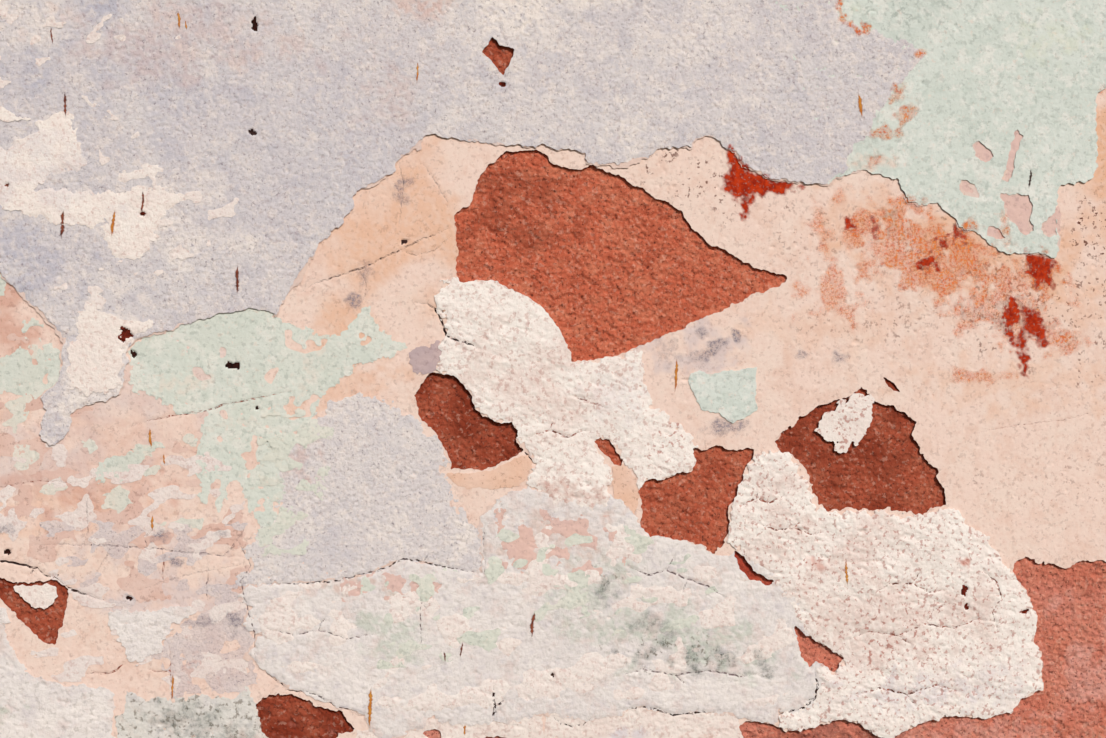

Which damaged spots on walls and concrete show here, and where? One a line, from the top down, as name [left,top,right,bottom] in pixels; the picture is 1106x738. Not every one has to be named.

flaking render [0,0,924,475]
corrosion [724,145,804,219]
corrosion [845,199,1072,375]
flaking render [0,306,881,738]
spalling [775,387,946,515]